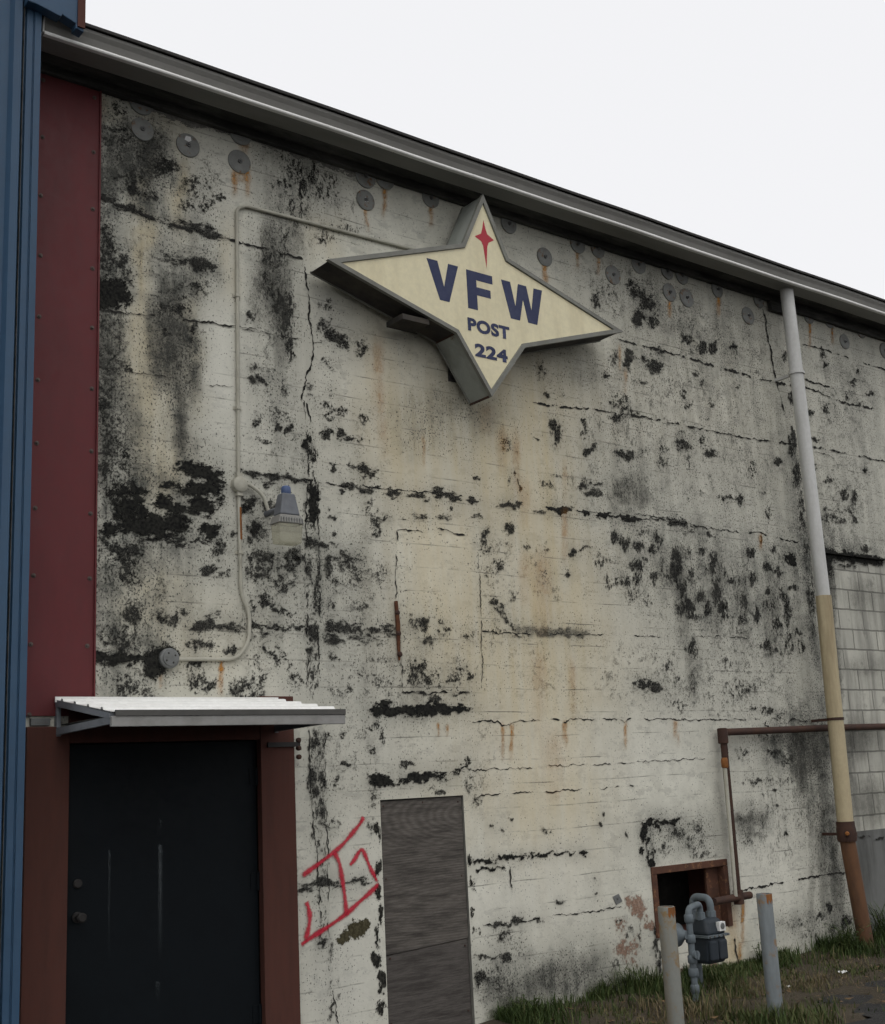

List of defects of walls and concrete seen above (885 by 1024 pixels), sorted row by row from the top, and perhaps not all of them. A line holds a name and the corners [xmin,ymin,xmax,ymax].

leakage [100,99,230,284]
crack [100,168,469,702]
mould [600,395,717,470]
crack [533,308,885,462]
mould [96,468,396,698]
corrosion [394,601,403,660]
crack [546,506,798,544]
mould [595,426,815,697]
mould [298,730,372,898]
crack [472,758,705,798]
crack [472,718,807,727]
flaking render [615,895,655,967]